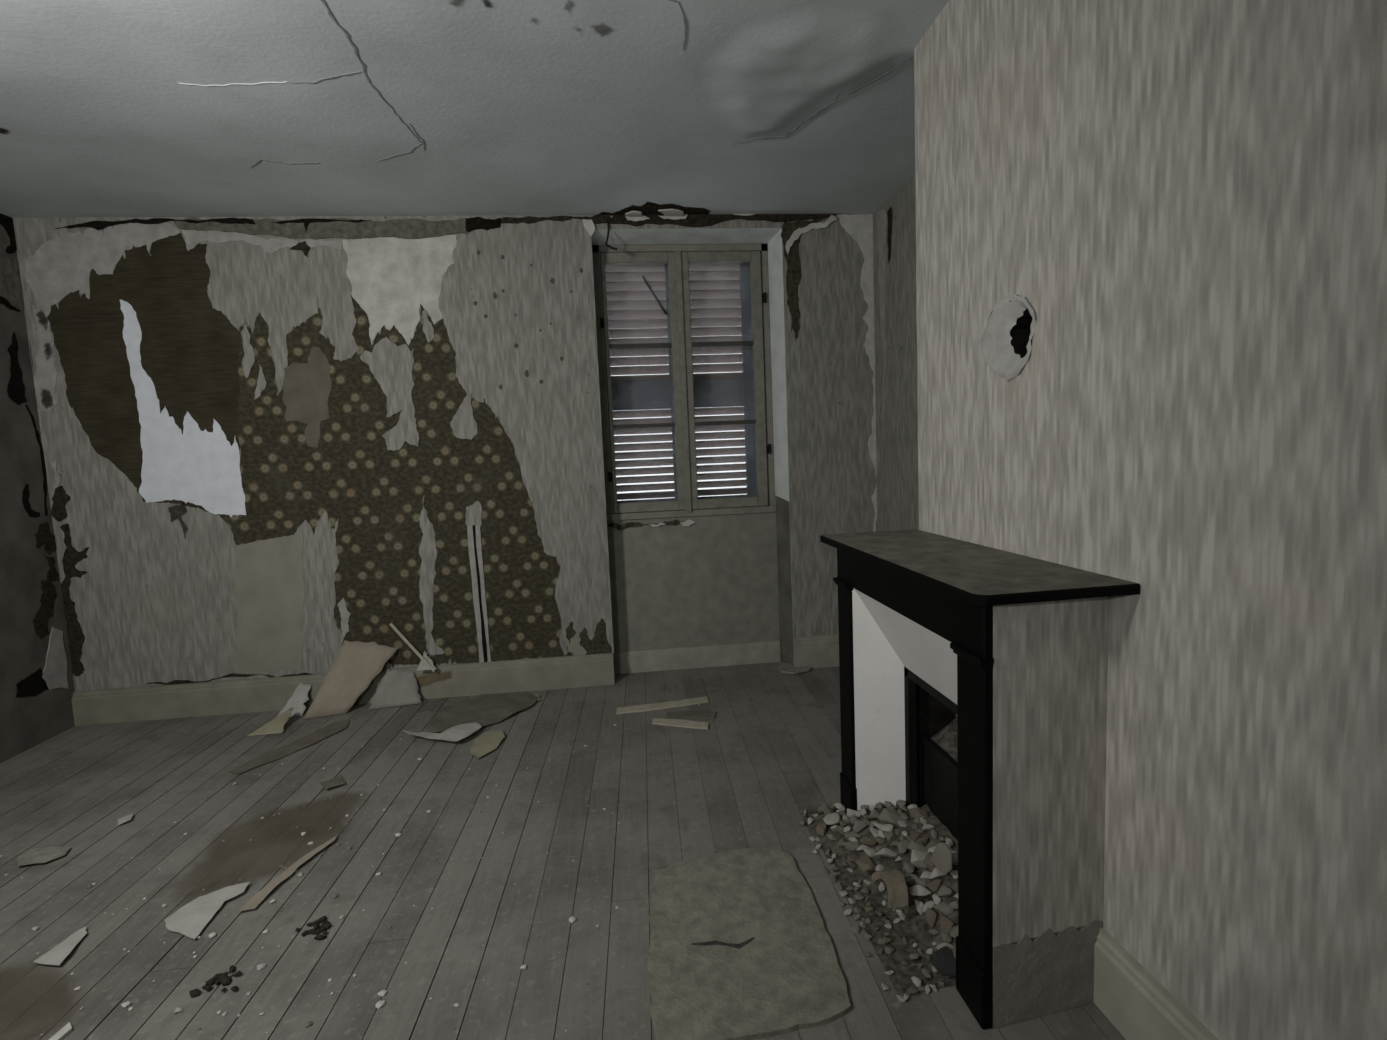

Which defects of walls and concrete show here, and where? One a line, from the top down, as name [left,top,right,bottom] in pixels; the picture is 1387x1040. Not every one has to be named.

crack [669,0,687,51]
crack [178,0,425,161]
spalling [582,202,711,236]
flaking render [0,213,501,451]
flaking render [120,300,246,517]
peeling [465,501,482,527]
peeling [419,495,444,655]
flaking render [16,627,69,697]
peeling [338,598,350,639]
peeling [568,634,587,656]